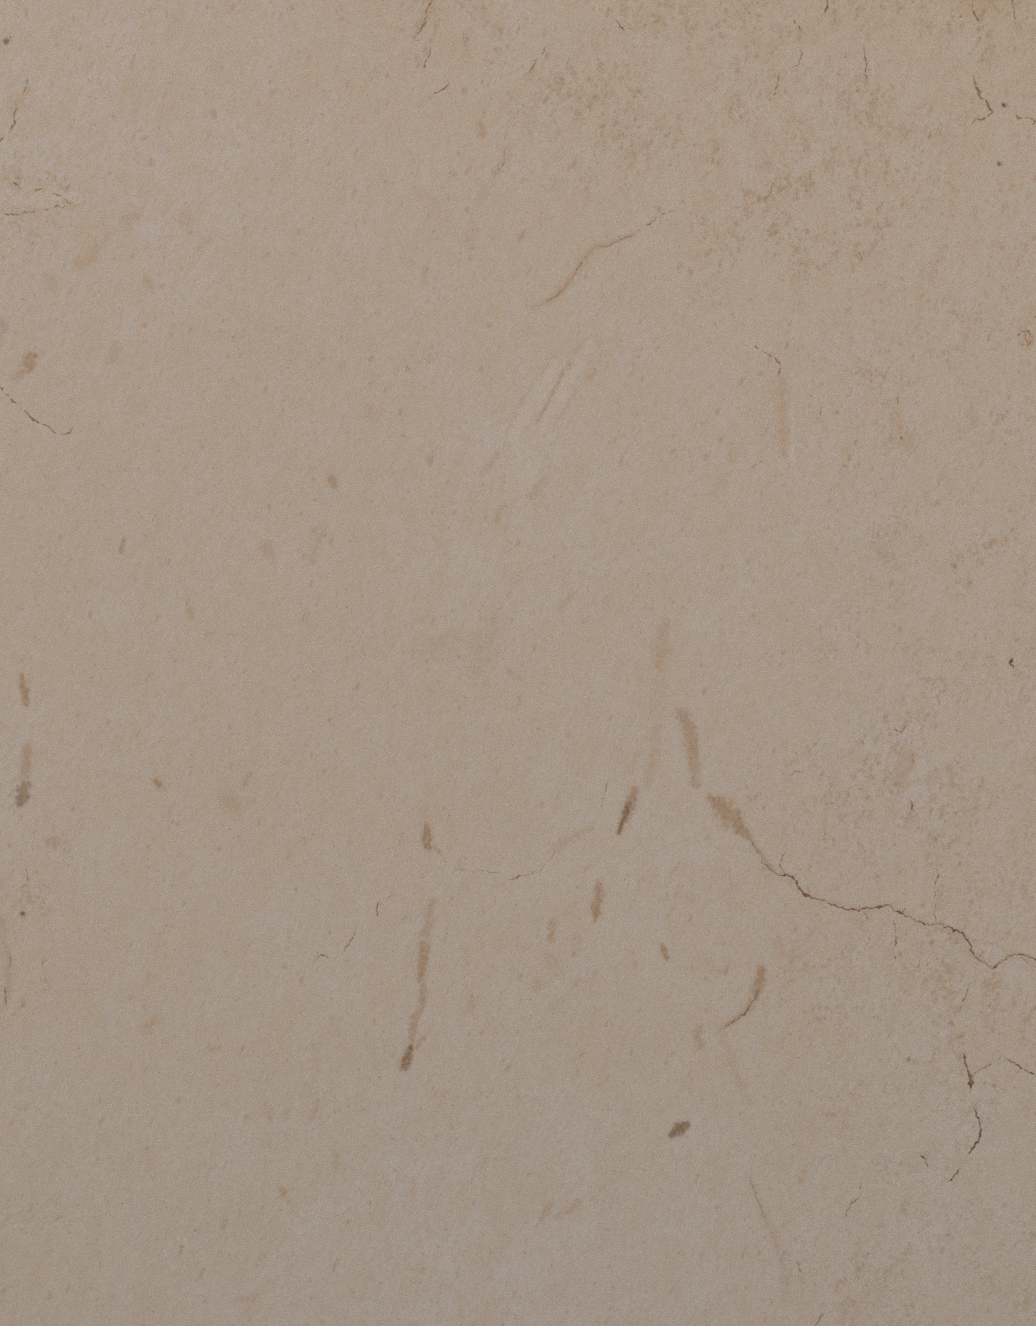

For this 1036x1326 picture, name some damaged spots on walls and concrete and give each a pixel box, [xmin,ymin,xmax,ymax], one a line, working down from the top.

crack [752,842,1036,1182]